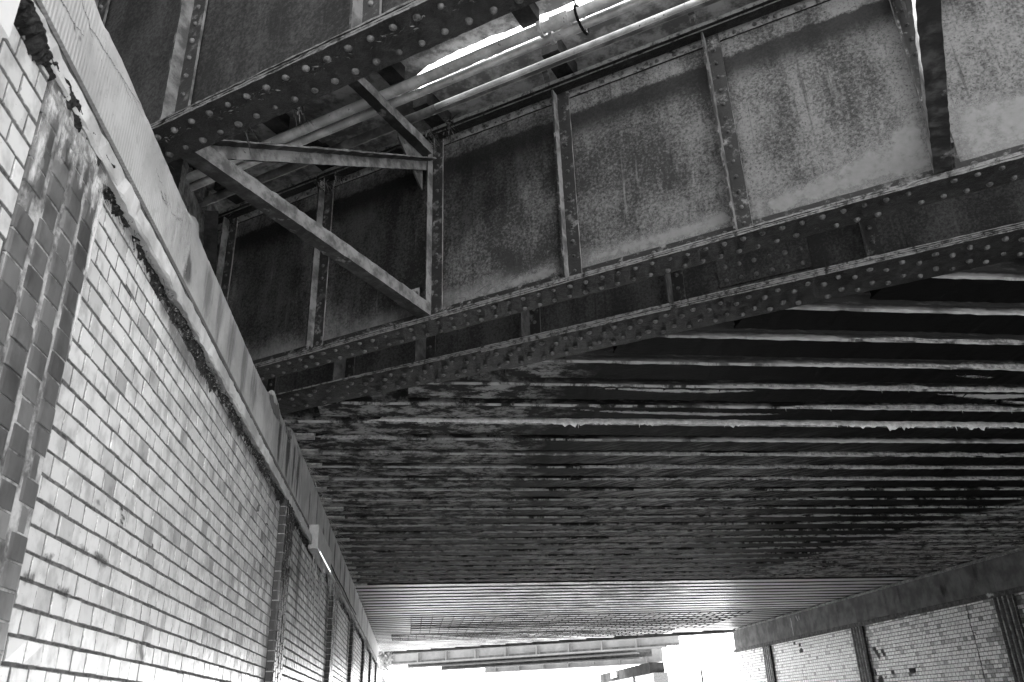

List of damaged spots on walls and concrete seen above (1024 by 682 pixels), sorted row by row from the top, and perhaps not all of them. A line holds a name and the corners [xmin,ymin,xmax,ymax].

leakage [369,362,1024,431]
leakage [315,433,429,453]